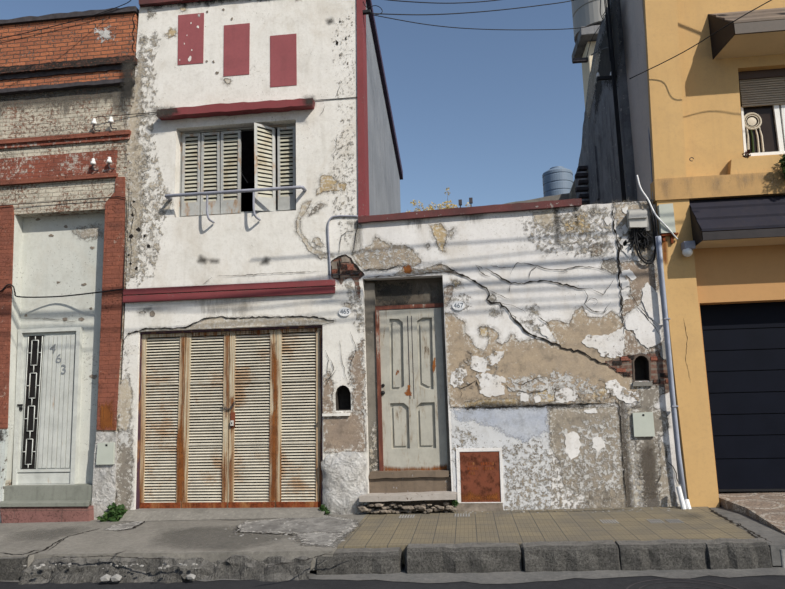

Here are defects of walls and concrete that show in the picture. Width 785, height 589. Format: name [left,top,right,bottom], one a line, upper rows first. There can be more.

peeling [122,27,176,287]
peeling [296,13,680,510]
crack [364,210,666,377]
peeling [115,316,334,510]
rust [177,330,278,503]
rust [461,491,498,501]